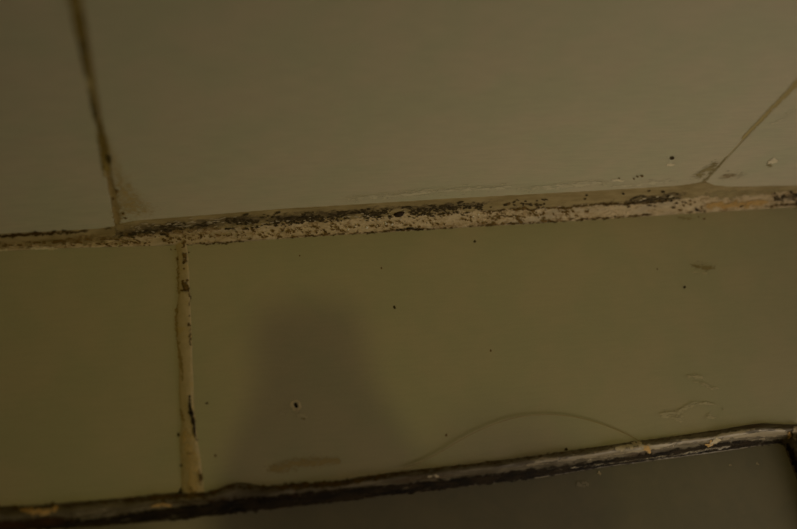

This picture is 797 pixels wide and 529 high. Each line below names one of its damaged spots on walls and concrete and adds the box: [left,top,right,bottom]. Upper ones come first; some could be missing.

water stain [2,0,589,305]
water stain [608,190,706,220]
water stain [188,395,198,441]
water stain [0,440,797,529]